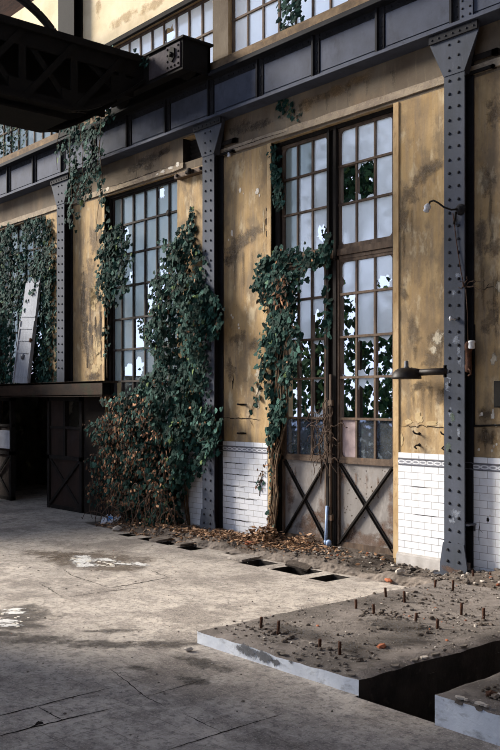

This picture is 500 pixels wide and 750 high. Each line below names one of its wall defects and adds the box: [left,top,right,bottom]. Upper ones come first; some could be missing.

water stain [225,227,263,265]
water stain [81,230,102,364]
water stain [26,551,152,571]
crack [0,671,208,736]
crack [168,714,278,750]